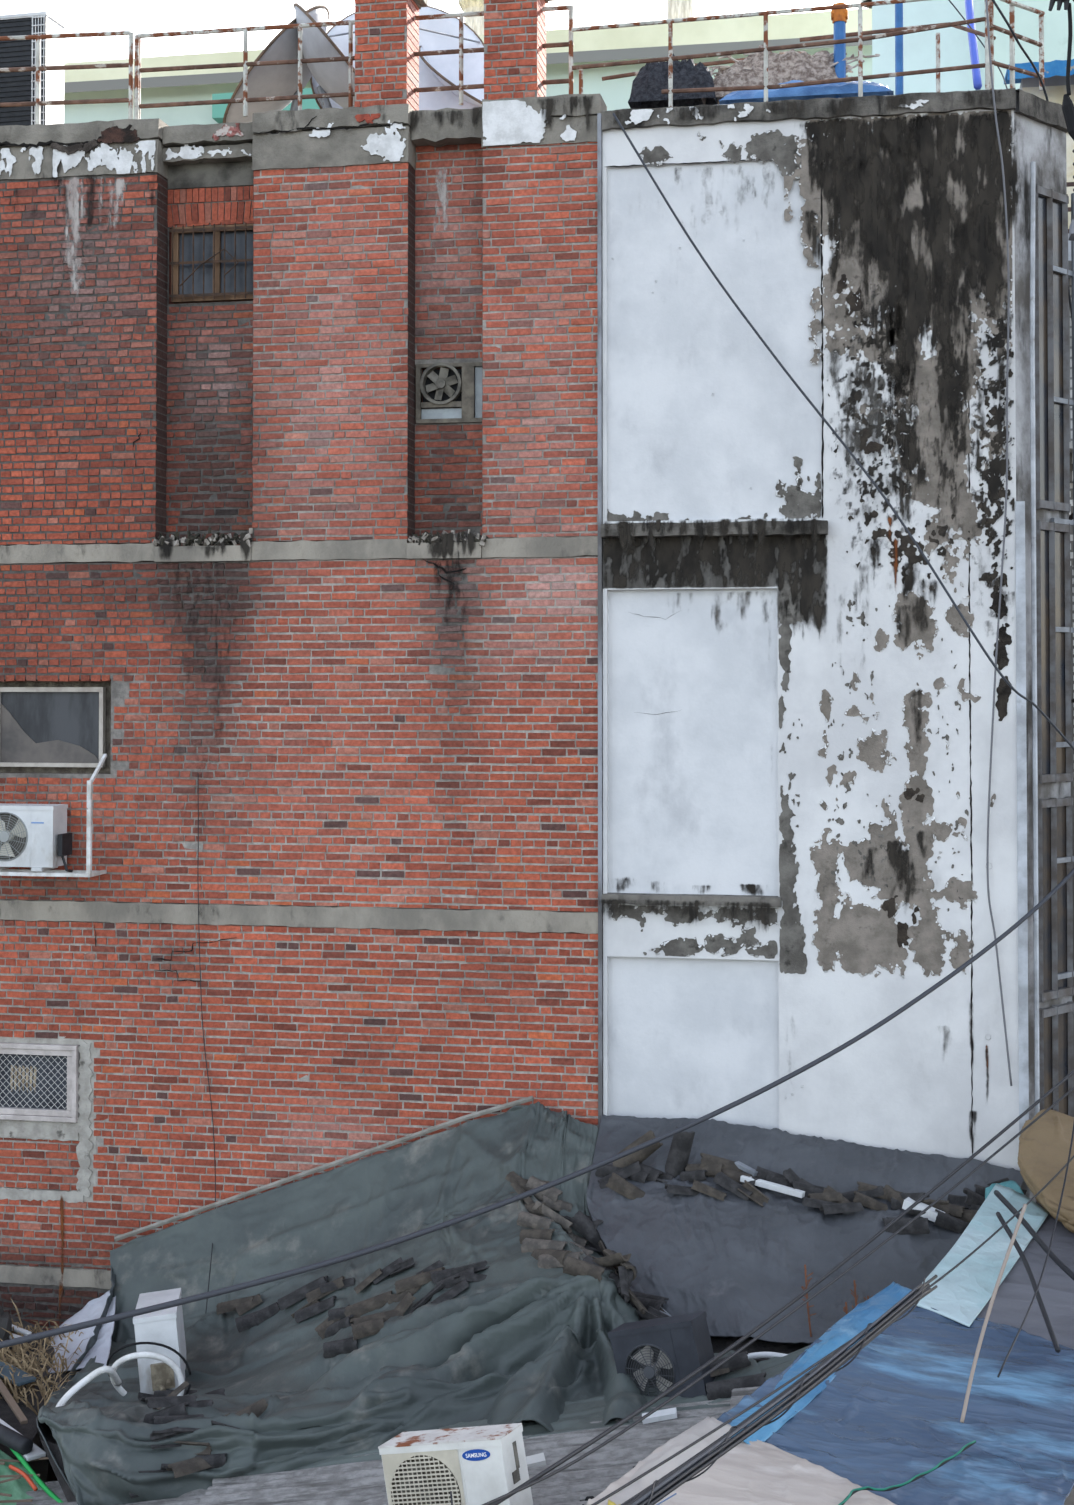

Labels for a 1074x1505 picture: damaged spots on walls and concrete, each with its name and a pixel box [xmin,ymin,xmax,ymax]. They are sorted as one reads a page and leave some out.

peeling [0,123,251,178]
peeling [309,123,334,138]
peeling [355,113,406,162]
peeling [482,100,577,146]
water stain [52,160,124,290]
water stain [767,90,1021,626]
water stain [205,532,254,560]
water stain [428,532,476,614]
water stain [603,518,827,634]
peeling [607,99,1014,978]
water stain [896,563,937,646]
water stain [865,831,925,904]